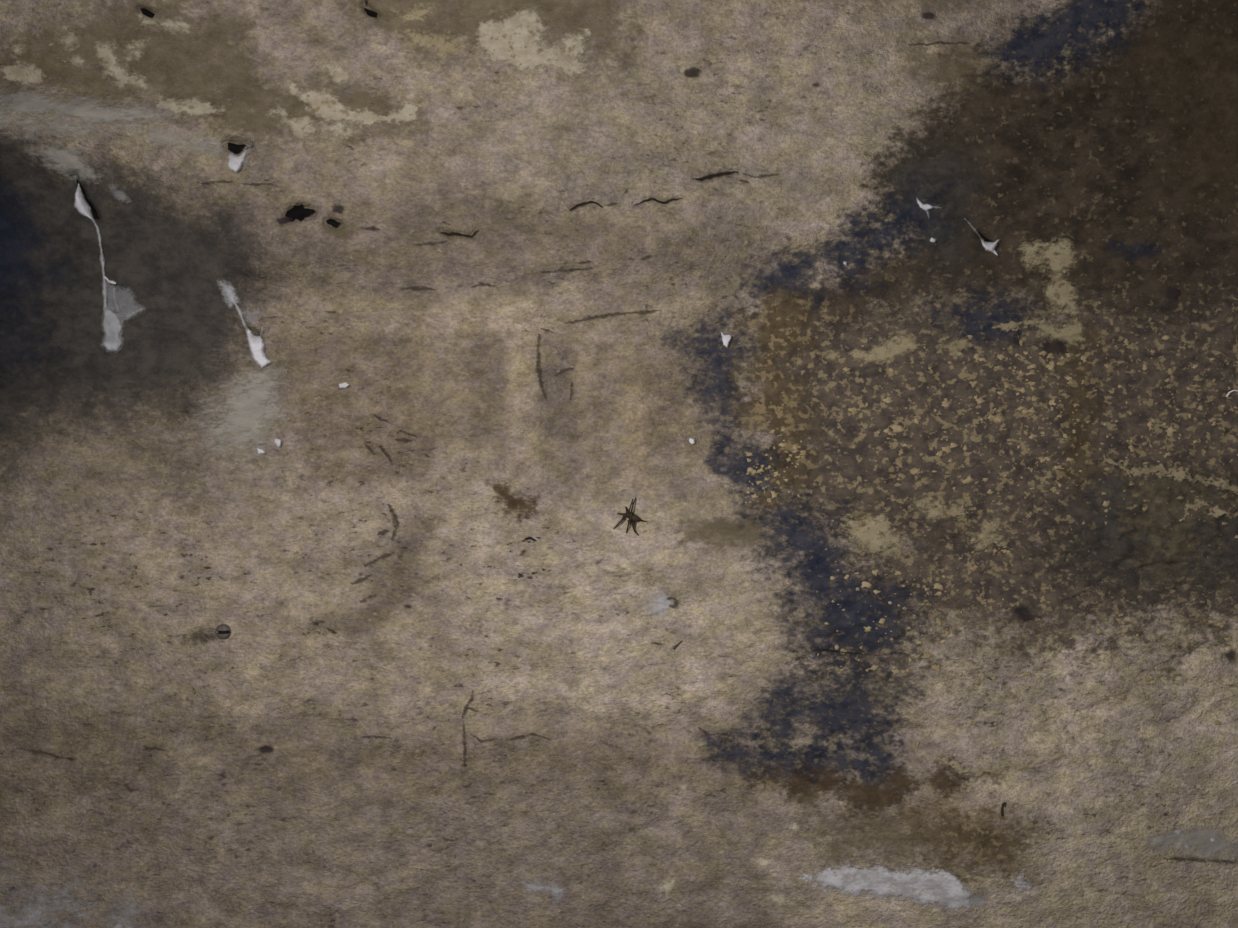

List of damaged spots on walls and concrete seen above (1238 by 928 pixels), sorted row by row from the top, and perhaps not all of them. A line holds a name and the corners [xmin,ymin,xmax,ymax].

leakage [0,0,426,456]
leakage [662,0,1238,786]